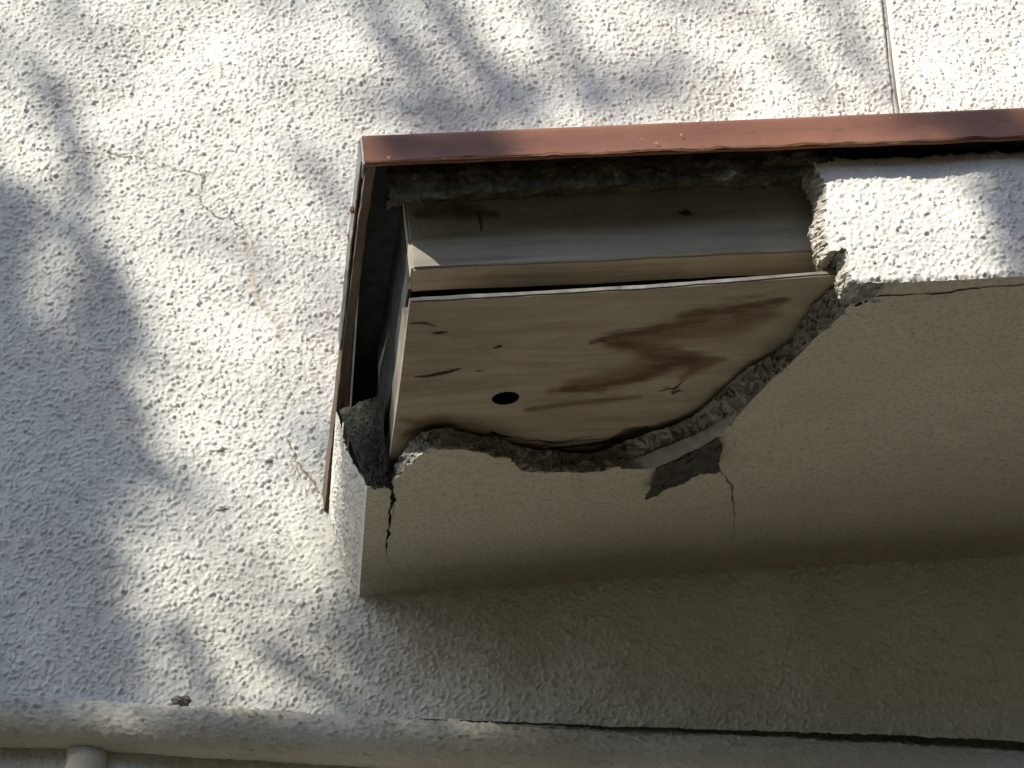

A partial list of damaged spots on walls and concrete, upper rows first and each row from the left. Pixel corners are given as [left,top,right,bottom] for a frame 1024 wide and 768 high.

crack [35,148,256,255]
spalling [339,163,894,538]
damp [560,298,789,405]
crack [386,480,396,553]